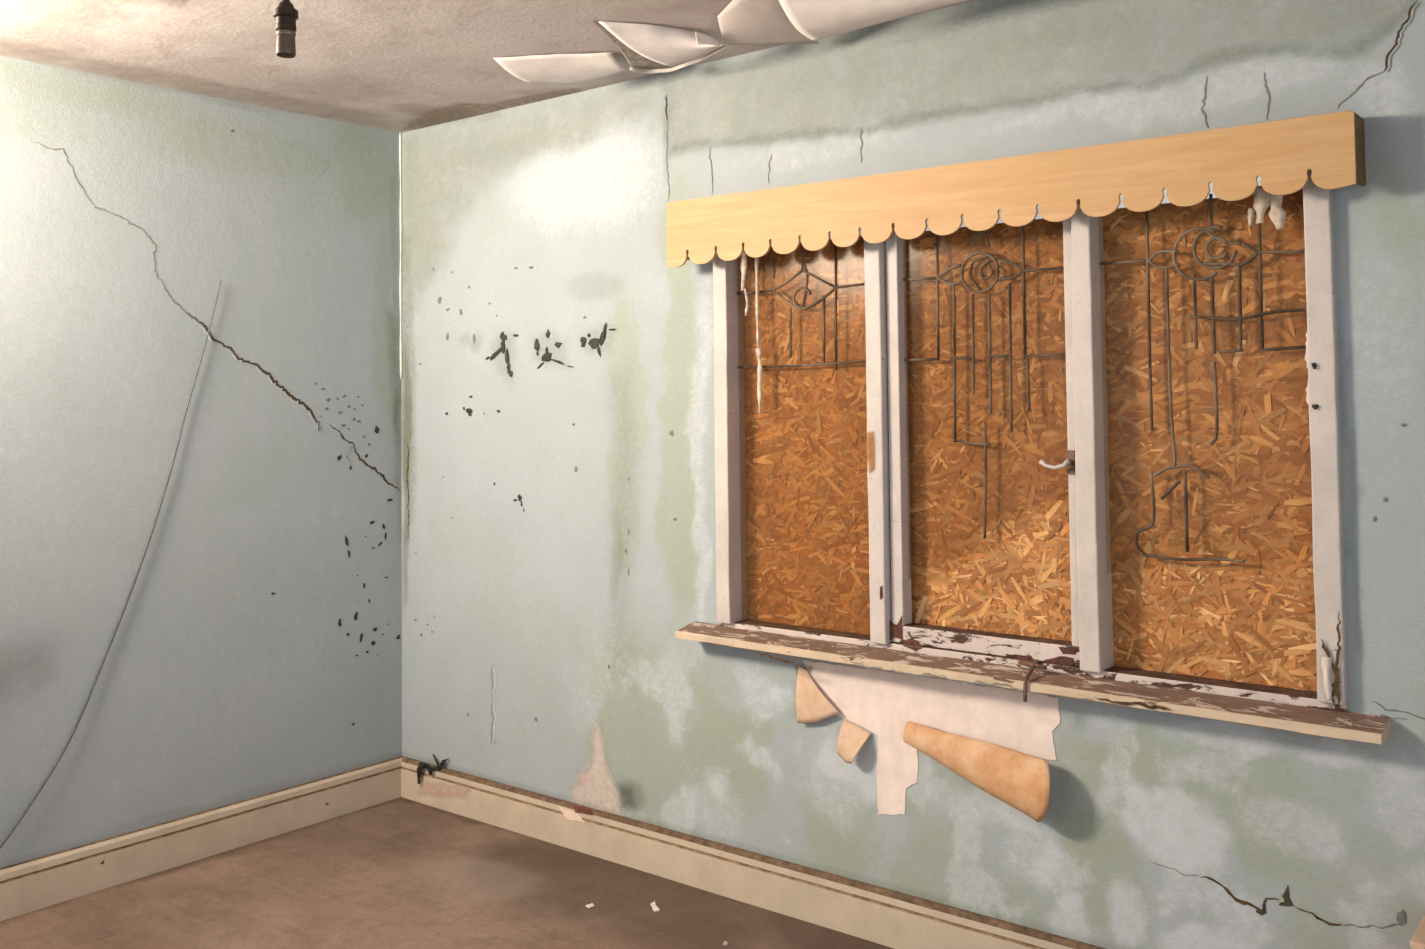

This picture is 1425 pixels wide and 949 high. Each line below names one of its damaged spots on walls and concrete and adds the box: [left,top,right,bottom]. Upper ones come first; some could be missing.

crack [1338,1,1420,108]
crack [34,142,409,538]
damp [315,383,379,470]
damp [338,575,400,657]
flaking render [559,728,620,823]
flaking render [759,652,1061,815]
peeling [1095,698,1171,710]
crack [1149,860,1401,929]
damp [1396,910,1406,925]